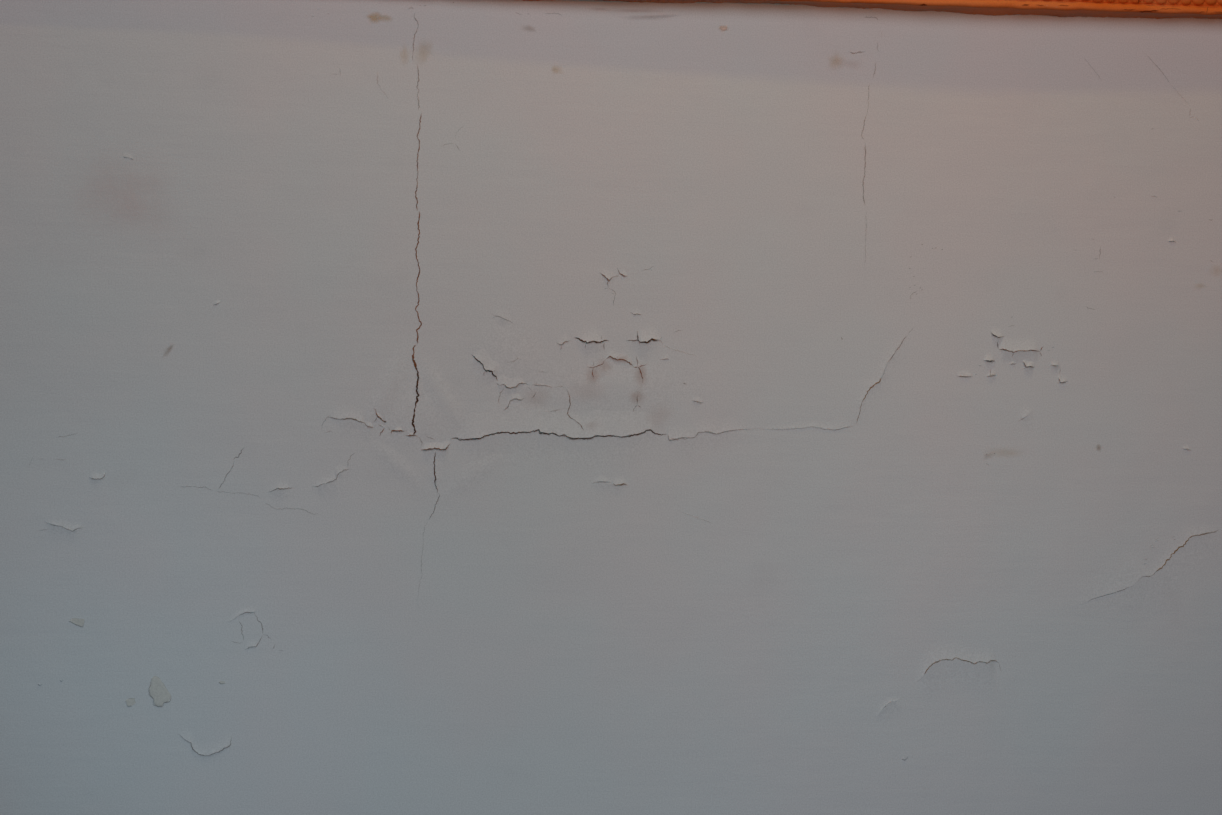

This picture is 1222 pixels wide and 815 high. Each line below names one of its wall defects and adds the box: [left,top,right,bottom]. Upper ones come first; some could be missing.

crack [409,20,761,517]
peeling [465,349,526,400]
peeling [556,323,663,377]
crack [852,334,910,425]
peeling [956,327,1068,385]
crack [1067,522,1222,621]
peeling [914,638,998,706]